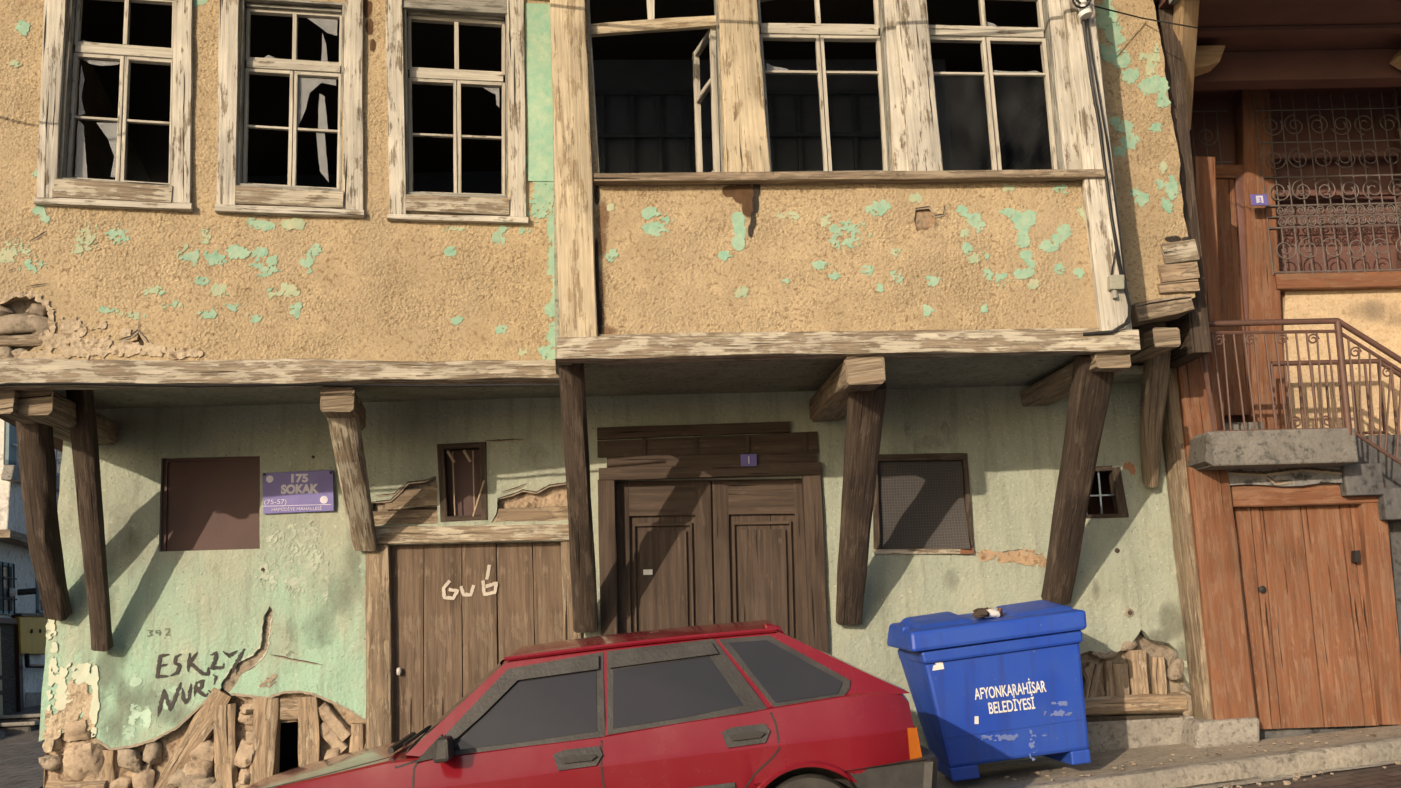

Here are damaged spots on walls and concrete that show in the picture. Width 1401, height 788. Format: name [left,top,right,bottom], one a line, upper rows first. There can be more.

peeling [1096,0,1171,157]
spalling [0,217,322,360]
peeling [810,199,891,280]
peeling [861,248,904,292]
spalling [909,192,936,231]
peeling [956,183,1086,290]
peeling [1130,161,1179,217]
spalling [373,478,438,525]
spalling [492,485,568,522]
spalling [978,548,1047,568]
spalling [38,607,366,788]
spalling [1080,634,1193,722]